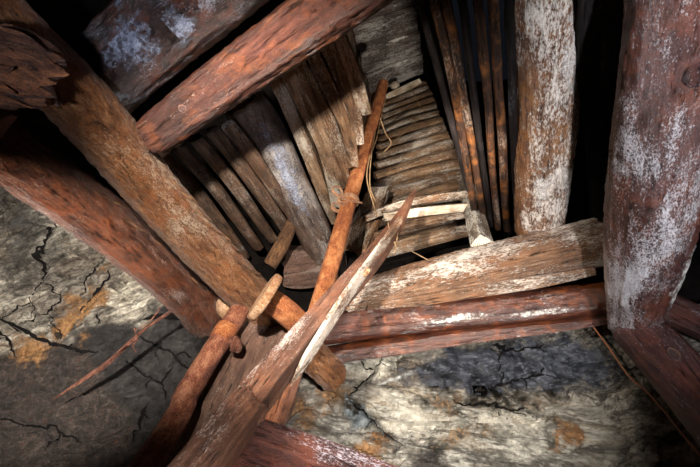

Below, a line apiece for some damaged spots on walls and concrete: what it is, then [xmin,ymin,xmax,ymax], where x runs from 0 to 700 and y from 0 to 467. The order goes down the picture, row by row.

crack [0,223,98,356]
corrosion [54,291,108,339]
crack [80,261,110,324]
corrosion [15,334,49,362]
crack [125,336,190,400]
crack [453,343,556,416]
crack [0,418,81,447]
crack [132,406,149,441]